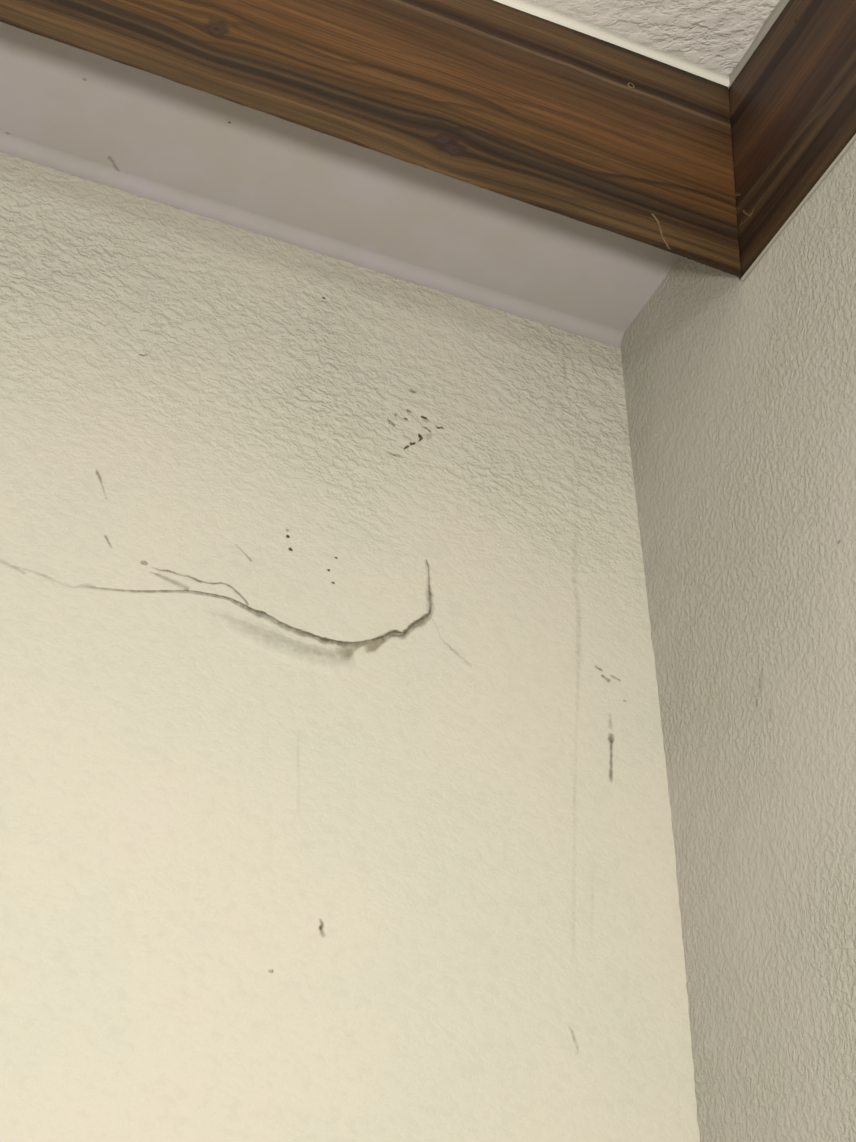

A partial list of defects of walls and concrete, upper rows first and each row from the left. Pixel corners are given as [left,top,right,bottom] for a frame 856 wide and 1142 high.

crack [154,570,430,645]